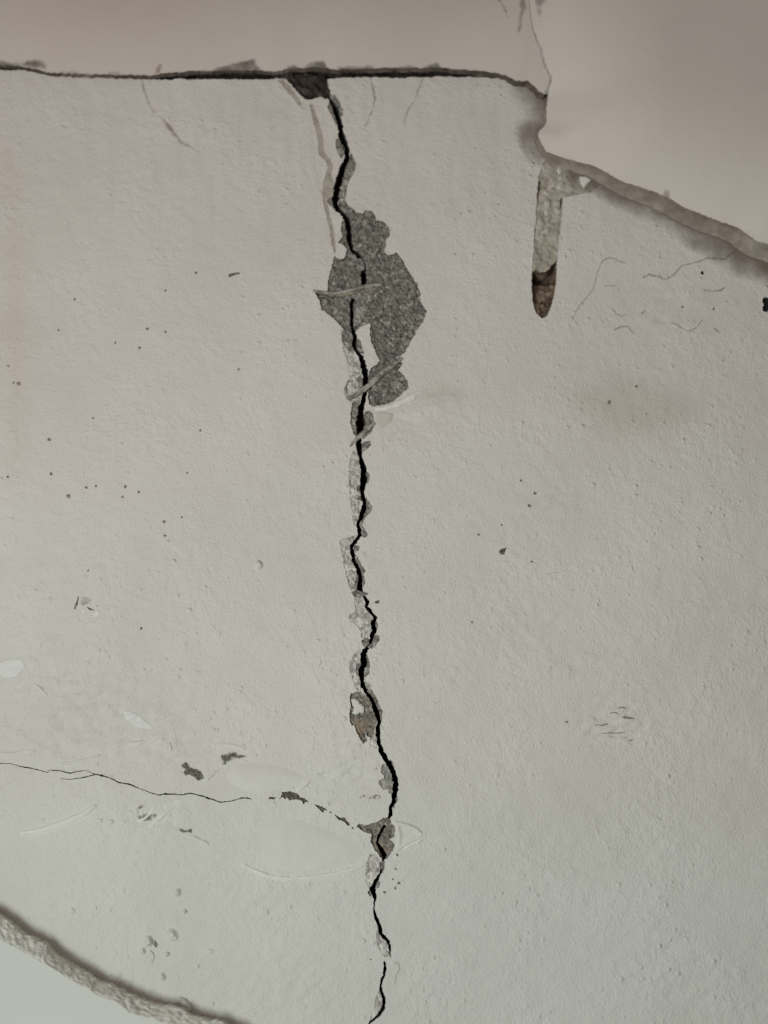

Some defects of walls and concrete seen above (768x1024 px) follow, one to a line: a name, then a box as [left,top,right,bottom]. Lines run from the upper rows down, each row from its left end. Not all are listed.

flaking render [313,203,427,407]
spalling [531,260,557,318]
crack [0,71,485,1024]
flaking render [379,764,393,794]
spalling [0,912,229,1024]